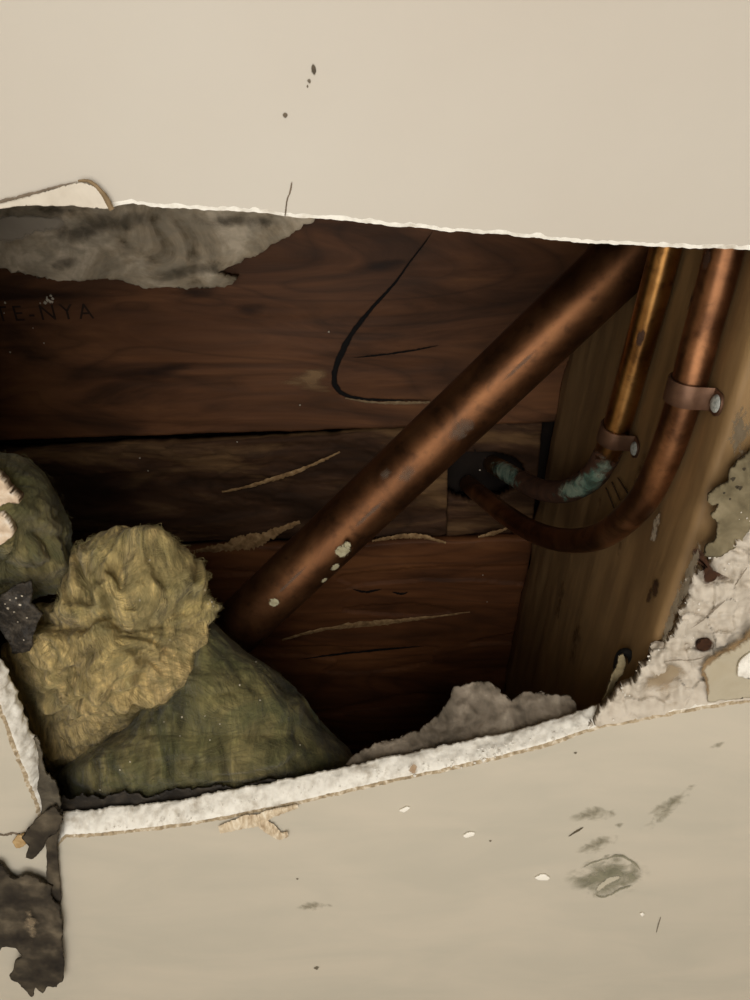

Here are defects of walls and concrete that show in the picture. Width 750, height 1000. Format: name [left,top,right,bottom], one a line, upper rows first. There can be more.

peeling [0,179,114,211]
crack [331,234,435,405]
flaking render [588,530,750,728]
water stain [578,854,639,898]